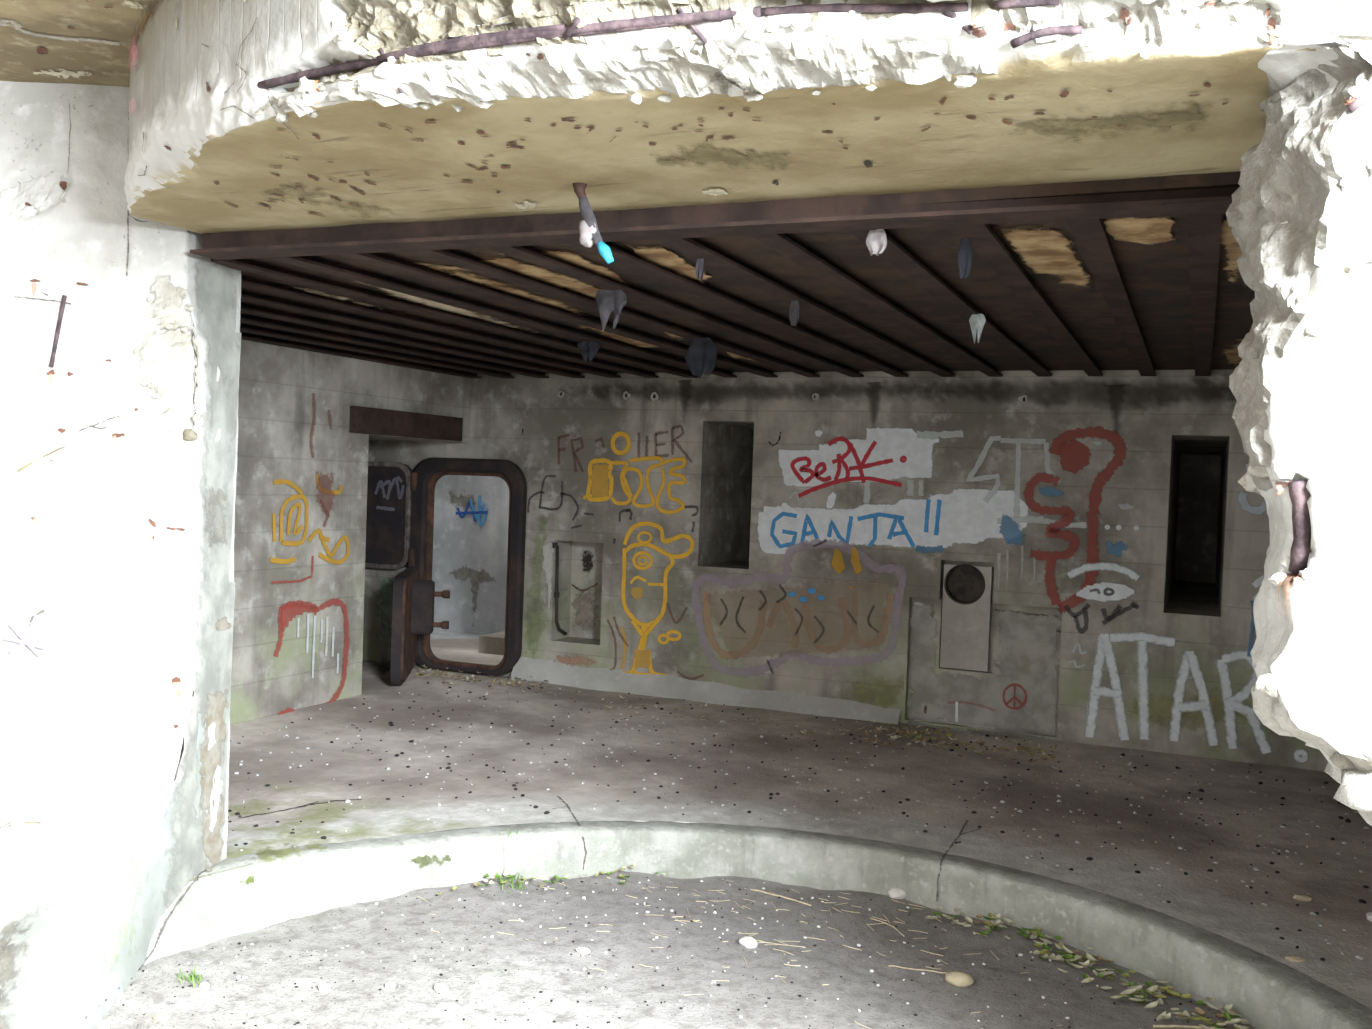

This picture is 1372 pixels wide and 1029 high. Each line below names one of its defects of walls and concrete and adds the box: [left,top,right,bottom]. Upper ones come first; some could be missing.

spalling [253,0,1292,122]
rust [972,24,988,38]
spalling [1220,38,1372,587]
rust [1275,481,1294,496]
damp [0,923,27,1029]